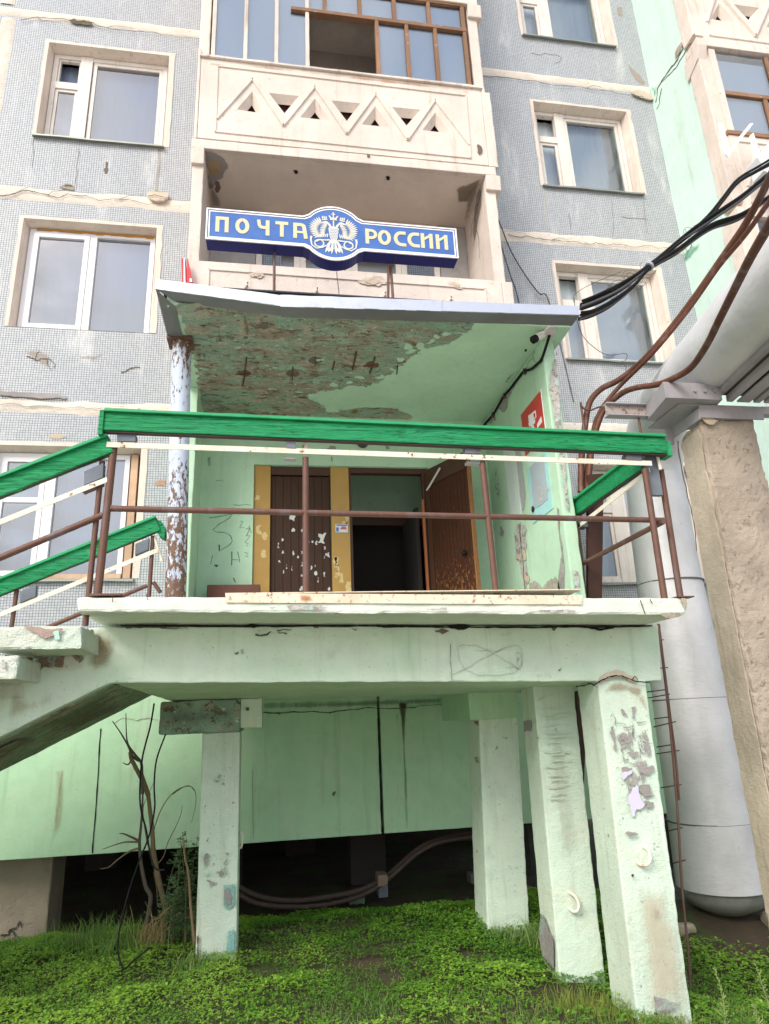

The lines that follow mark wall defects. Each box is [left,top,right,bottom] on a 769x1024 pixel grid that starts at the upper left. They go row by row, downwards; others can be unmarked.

spalling [205,151,228,193]
peeling [176,302,474,420]
peeling [500,451,579,590]
spalling [610,598,692,988]
peeling [539,914,554,971]